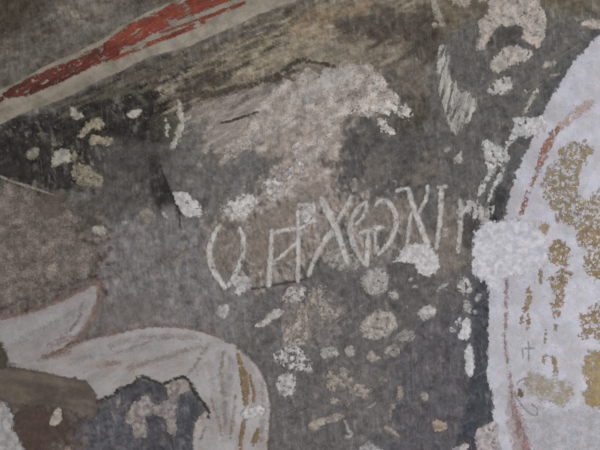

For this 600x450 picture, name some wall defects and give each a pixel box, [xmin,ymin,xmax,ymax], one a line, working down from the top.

flaking render [451,0,547,95]
flaking render [69,106,113,146]
damp [149,84,273,149]
flaking render [51,142,104,188]
flaking render [172,192,202,217]
flaking render [360,265,399,300]
flaking render [392,242,440,288]
flaking render [417,304,436,321]
flaking render [255,284,341,397]
flaking render [320,345,355,359]
flaking render [359,309,416,363]
flaking render [326,366,373,406]